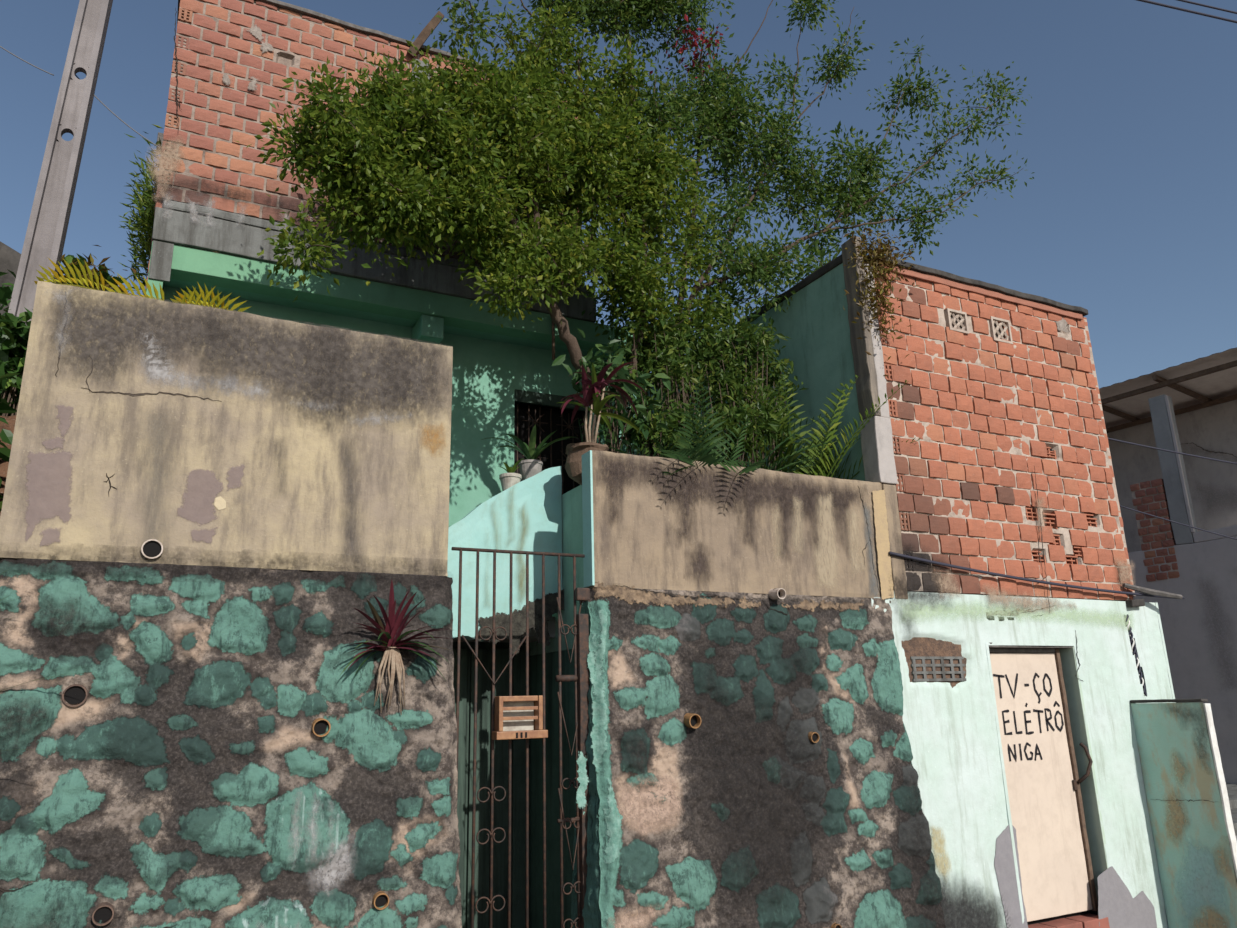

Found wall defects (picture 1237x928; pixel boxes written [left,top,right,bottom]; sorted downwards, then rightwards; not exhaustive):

crack [55,292,222,402]
leakage [56,295,441,420]
peeling [25,405,73,546]
peeling [177,465,244,543]
leakage [602,457,877,596]
spalling [901,637,967,688]